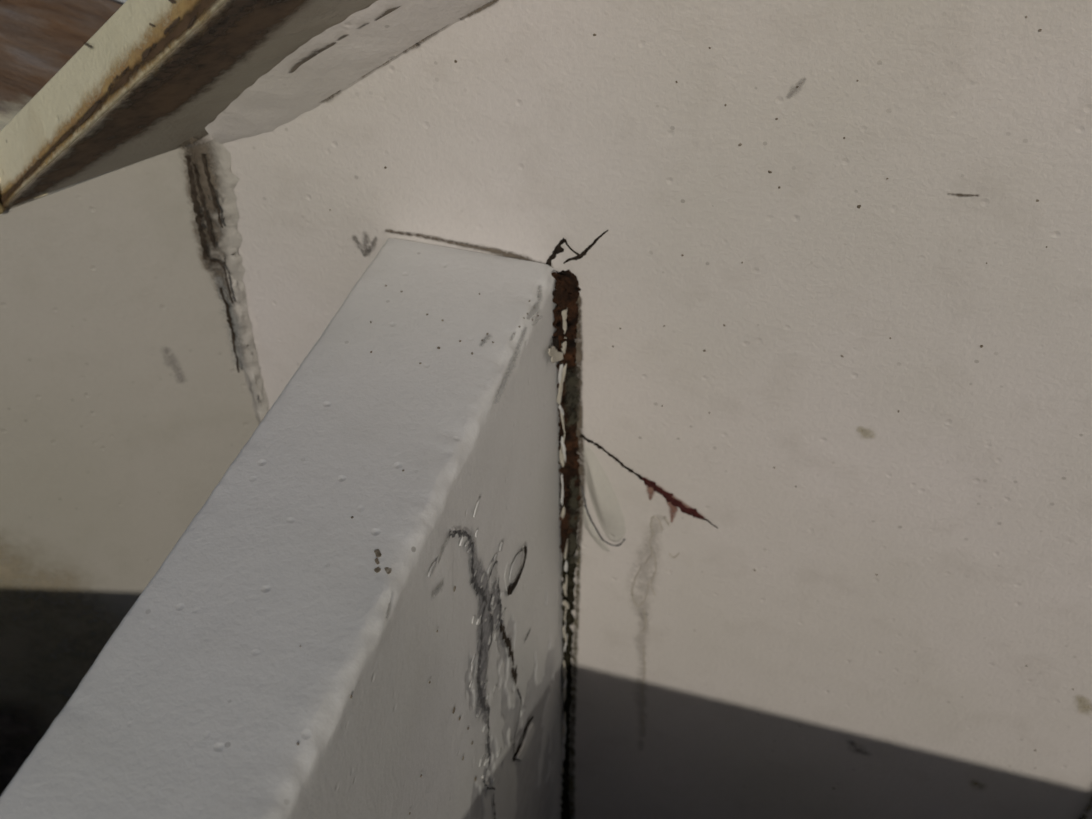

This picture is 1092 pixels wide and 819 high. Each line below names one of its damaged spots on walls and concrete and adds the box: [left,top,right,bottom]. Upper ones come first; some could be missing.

rust [0,0,307,206]
crack [185,153,240,373]
crack [385,230,608,267]
rust [551,270,581,556]
crack [579,434,718,529]
peeling [426,496,562,819]